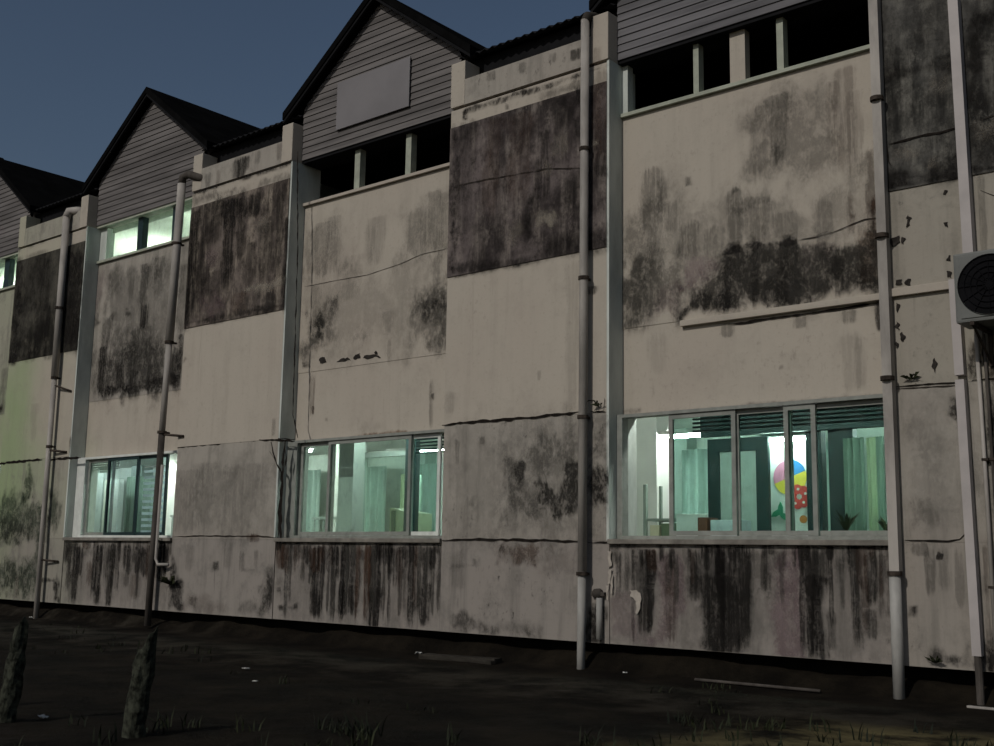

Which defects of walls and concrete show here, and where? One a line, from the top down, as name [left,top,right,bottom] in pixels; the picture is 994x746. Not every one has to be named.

water stain [185,211,200,321]
water stain [725,243,880,330]
water stain [97,334,183,397]
spalling [319,351,381,364]
crack [442,399,605,426]
water stain [539,463,609,518]
water stain [0,467,60,602]
water stain [64,541,182,610]
water stain [276,542,436,626]
water stain [612,544,675,631]
water stain [688,544,751,652]
water stain [777,545,835,659]